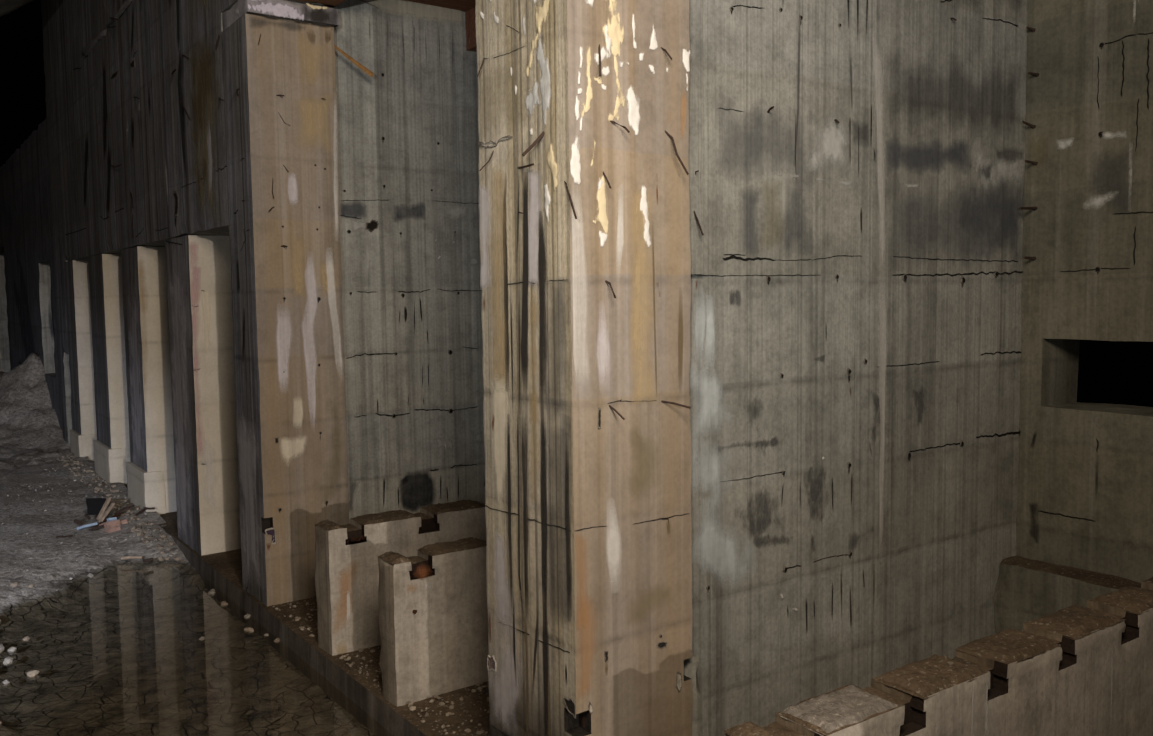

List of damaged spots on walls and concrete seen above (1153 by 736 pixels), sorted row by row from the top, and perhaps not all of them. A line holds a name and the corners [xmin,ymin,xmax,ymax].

peeling [510,0,550,135]
peeling [593,176,608,247]
peeling [544,0,668,222]
peeling [640,186,651,247]
crack [695,254,859,277]
water stain [811,55,966,250]
crack [893,256,1023,276]
water stain [470,174,572,736]
water stain [870,309,886,533]